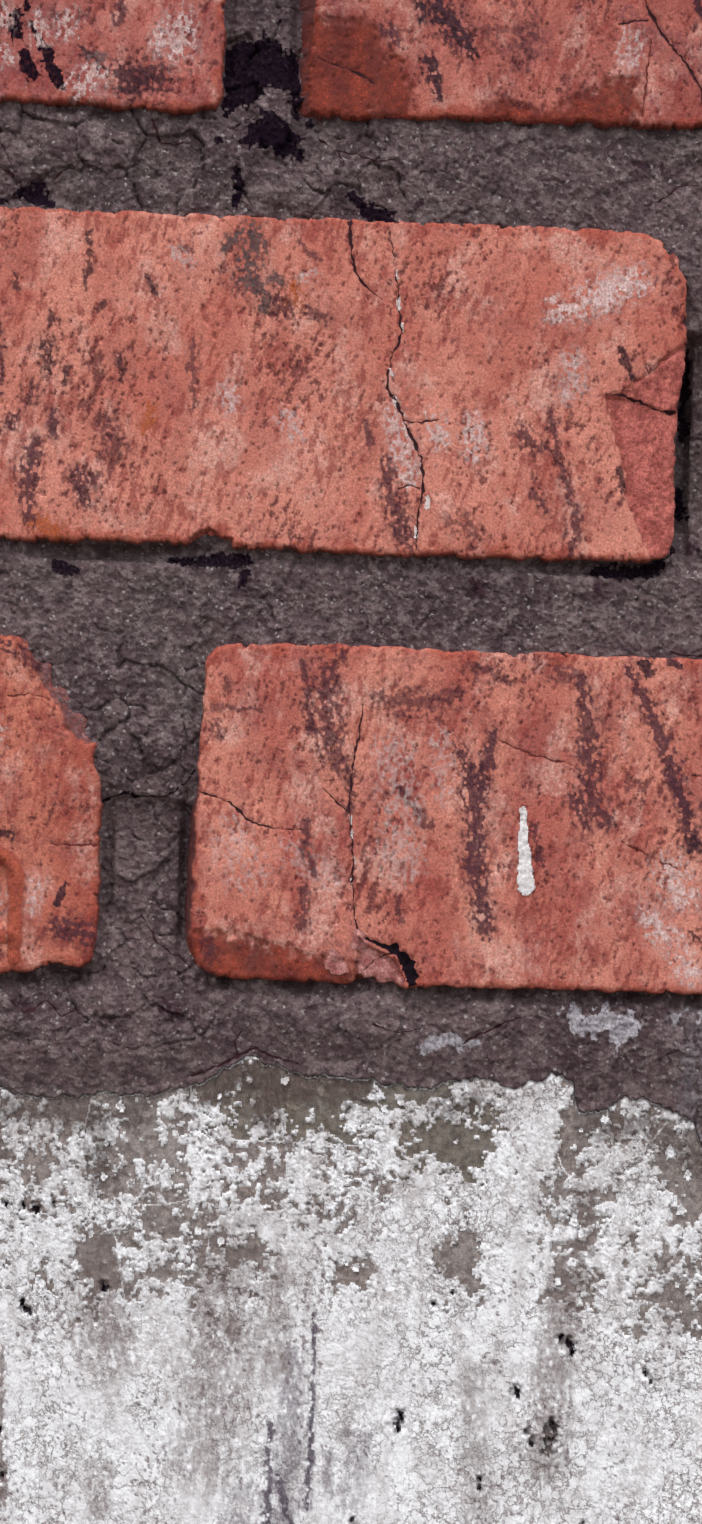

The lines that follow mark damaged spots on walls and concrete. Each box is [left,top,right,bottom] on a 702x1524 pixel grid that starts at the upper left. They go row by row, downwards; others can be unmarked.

crack [618,0,702,117]
crack [319,139,394,182]
crack [347,220,439,550]
crack [49,840,97,848]
crack [102,769,302,830]
crack [322,704,419,987]
crack [463,1015,533,1044]
water stain [0,1099,141,1186]
water stain [194,1059,370,1129]
water stain [533,1185,593,1471]
water stain [0,1345,9,1507]
water stain [261,1312,330,1524]